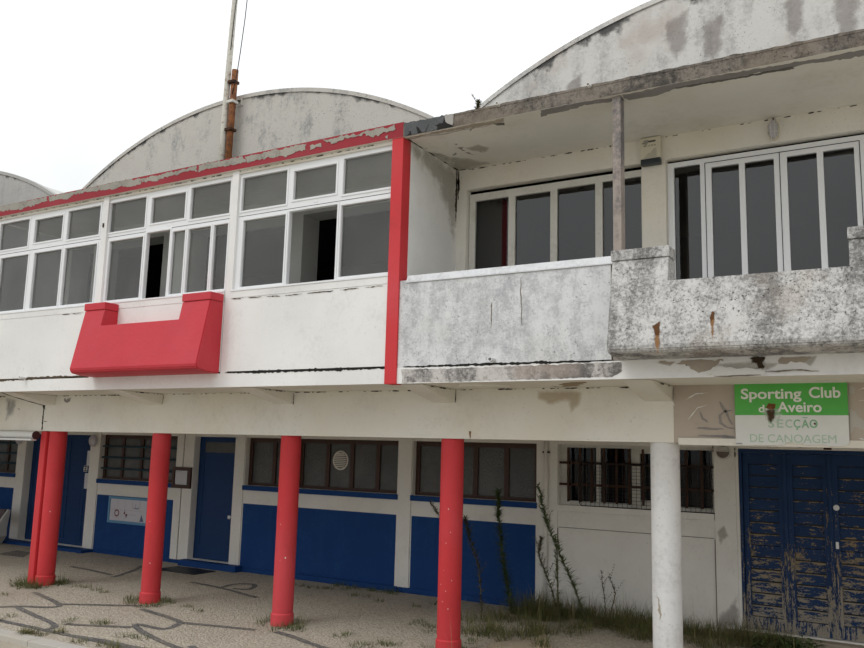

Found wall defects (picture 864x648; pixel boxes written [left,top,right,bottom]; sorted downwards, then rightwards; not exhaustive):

damp [578,16,628,44]
damp [523,48,567,77]
peeling [0,125,396,212]
corrosion [652,322,660,351]
peeling [659,356,812,377]